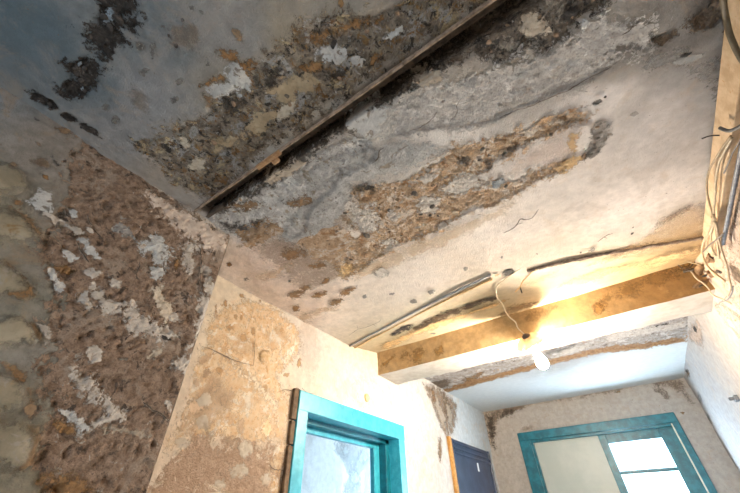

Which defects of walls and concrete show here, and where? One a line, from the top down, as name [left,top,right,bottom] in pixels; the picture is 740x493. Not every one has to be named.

flaking render [128,0,487,205]
flaking render [579,119,613,163]
peeling [24,187,85,236]
peeling [77,237,103,260]
peeling [82,267,104,279]
peeling [137,231,174,281]
water stain [558,246,705,289]
peeling [192,265,214,341]
peeling [85,345,103,364]
water stain [381,299,539,367]
flaking render [424,316,704,392]
flaking render [147,414,286,493]